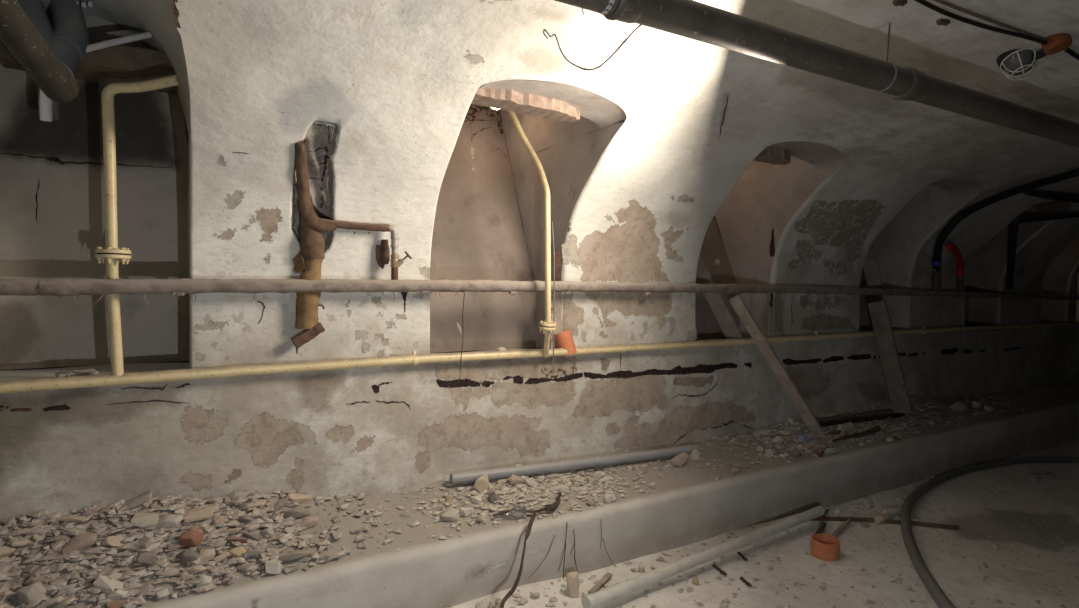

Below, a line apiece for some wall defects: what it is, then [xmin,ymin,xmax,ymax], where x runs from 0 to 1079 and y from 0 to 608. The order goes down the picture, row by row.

peeling [465,105,503,134]
spalling [214,120,339,263]
peeling [787,199,886,275]
rust [293,251,304,273]
peeling [413,199,756,474]
crack [782,346,1021,365]
crack [0,404,70,412]
crack [351,382,411,410]
crack [436,356,752,399]
peeling [179,405,375,493]